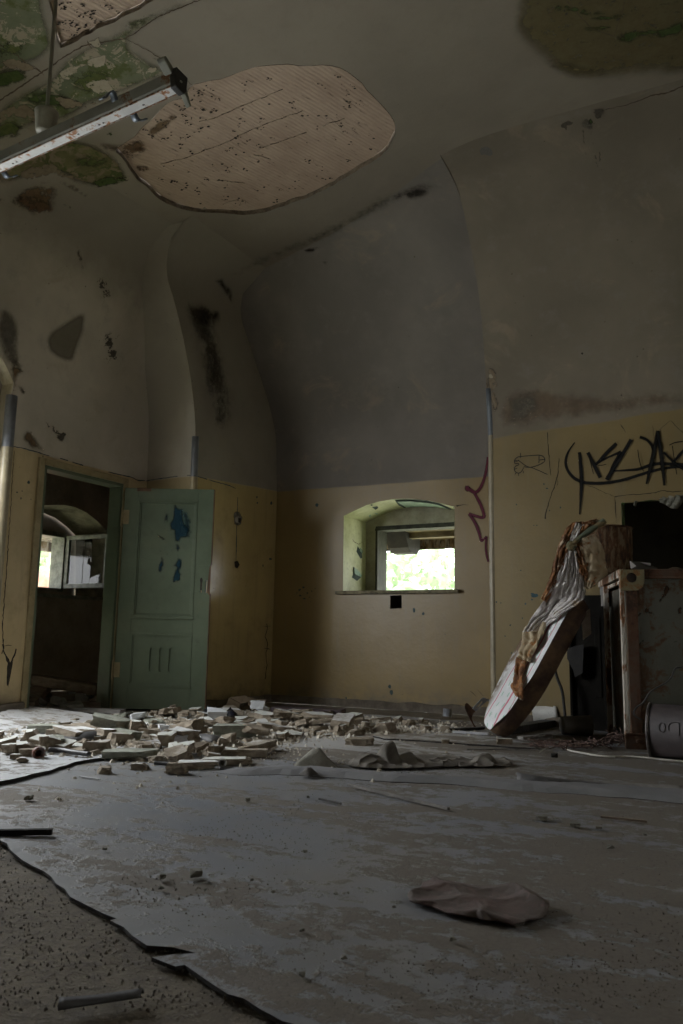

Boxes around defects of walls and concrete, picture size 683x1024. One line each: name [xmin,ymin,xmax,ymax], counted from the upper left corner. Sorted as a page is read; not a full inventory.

flaking render [48,0,153,48]
damp [0,142,128,213]
flaking render [116,64,395,215]
damp [190,308,225,422]
crack [1,452,17,686]